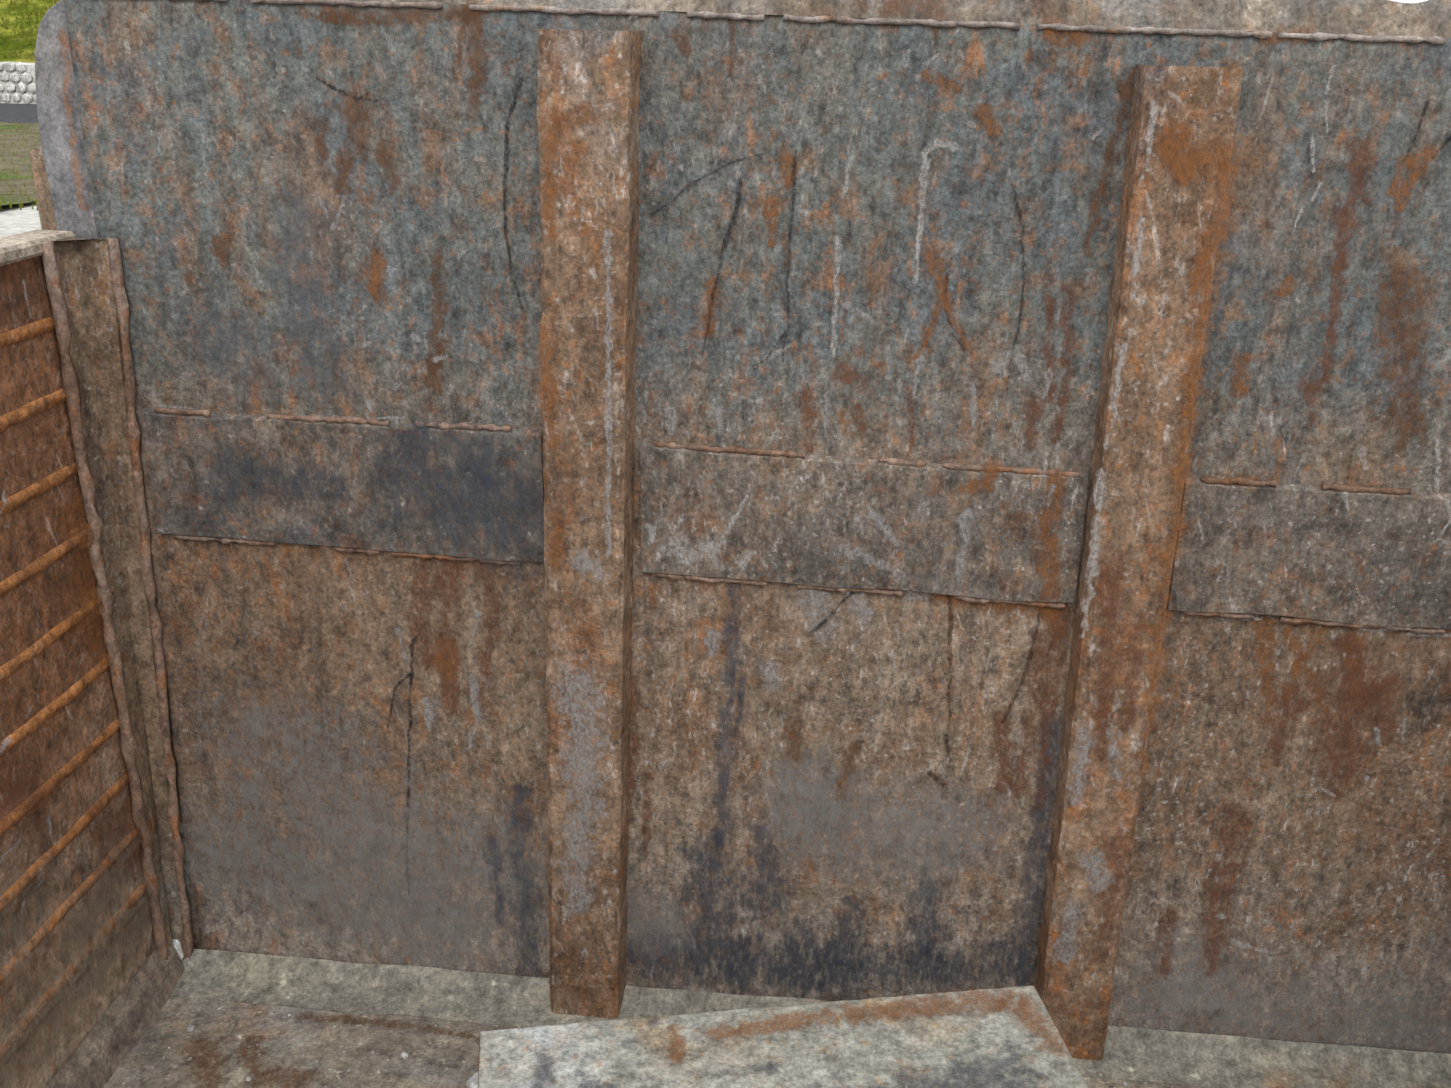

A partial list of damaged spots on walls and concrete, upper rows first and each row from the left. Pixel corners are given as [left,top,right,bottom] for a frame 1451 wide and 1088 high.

crack [503,77,523,308]
crack [650,153,796,365]
rust [1083,69,1135,257]
rust [1372,261,1430,454]
leakage [645,495,748,565]
leakage [834,543,894,570]
leakage [955,505,977,582]
rust [1093,225,1226,775]
crack [387,622,425,896]
leakage [626,551,1122,999]
crack [927,597,953,789]
rust [1256,617,1451,799]